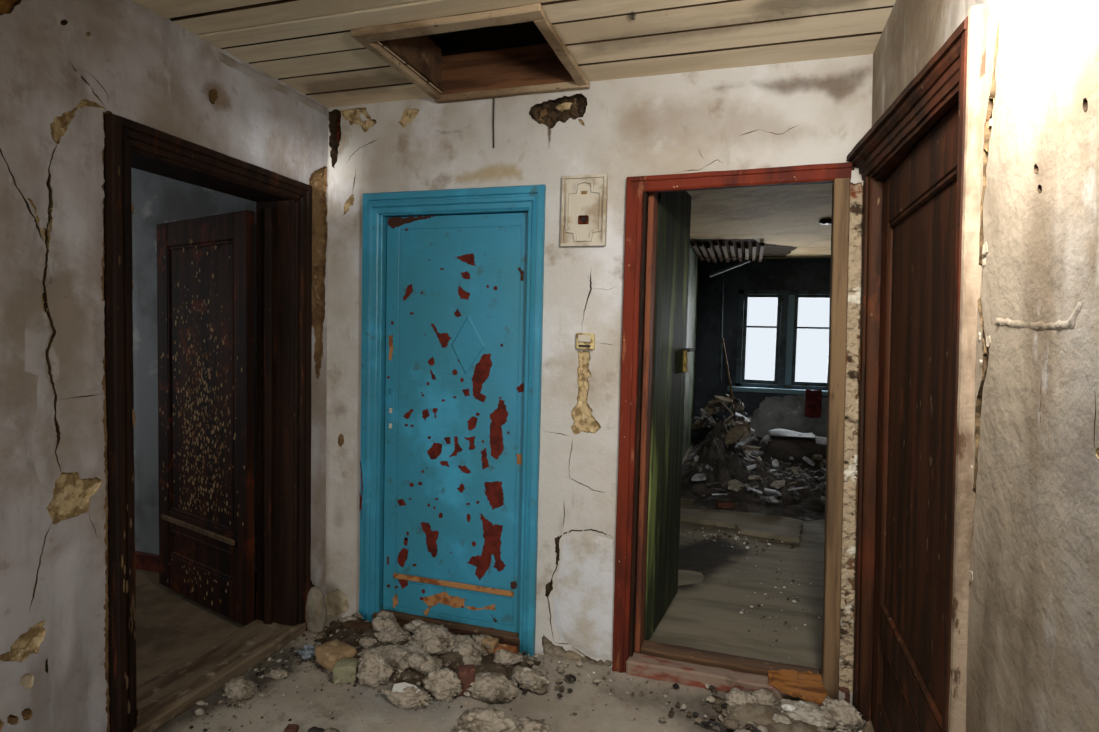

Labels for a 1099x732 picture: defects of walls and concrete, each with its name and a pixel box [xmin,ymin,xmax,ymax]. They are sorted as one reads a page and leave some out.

spalling [0,0,22,15]
spalling [50,99,112,144]
spalling [398,108,420,128]
spalling [529,93,587,129]
crack [0,119,98,472]
spalling [571,351,601,436]
spalling [46,324,136,732]
crack [546,431,611,660]
spalling [0,619,48,689]
spalling [0,708,33,732]